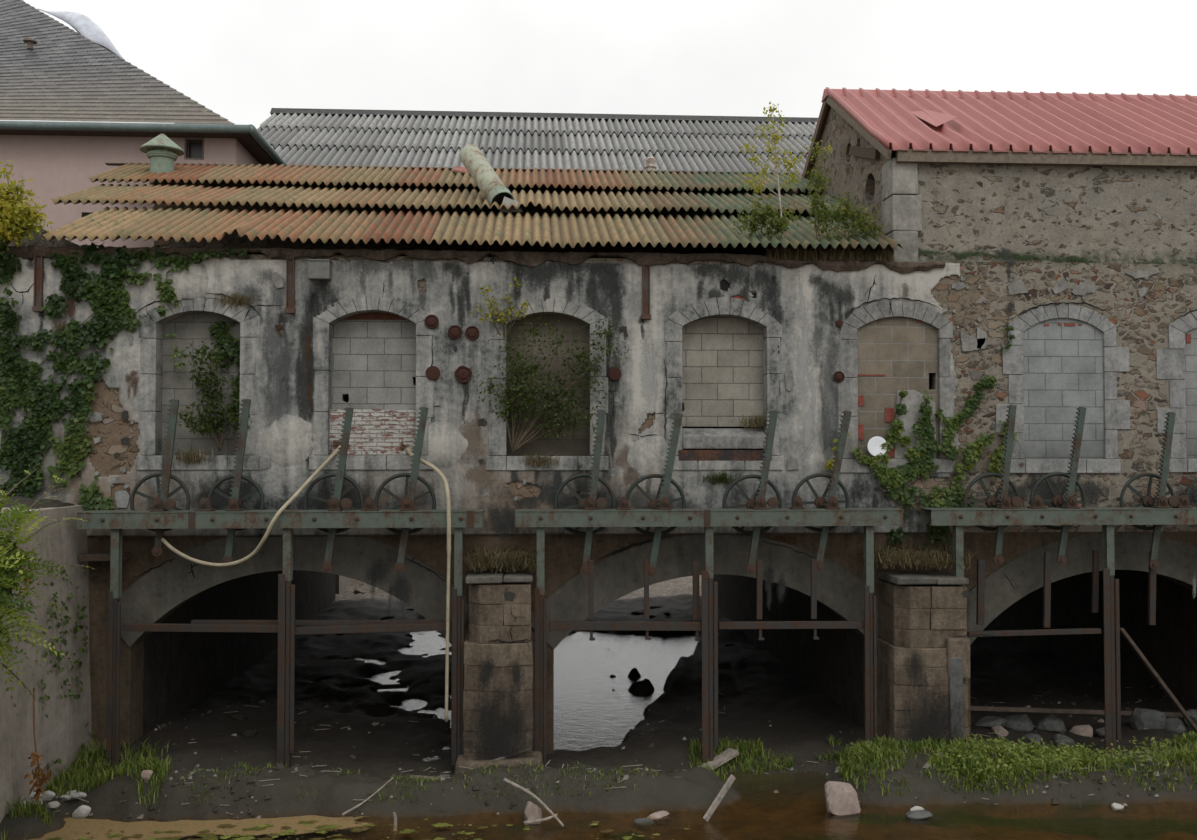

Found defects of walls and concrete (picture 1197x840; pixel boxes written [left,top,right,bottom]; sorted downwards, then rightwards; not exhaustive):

damp [243,270,339,421]
damp [693,264,783,324]
damp [810,276,854,449]
spalling [83,376,140,503]